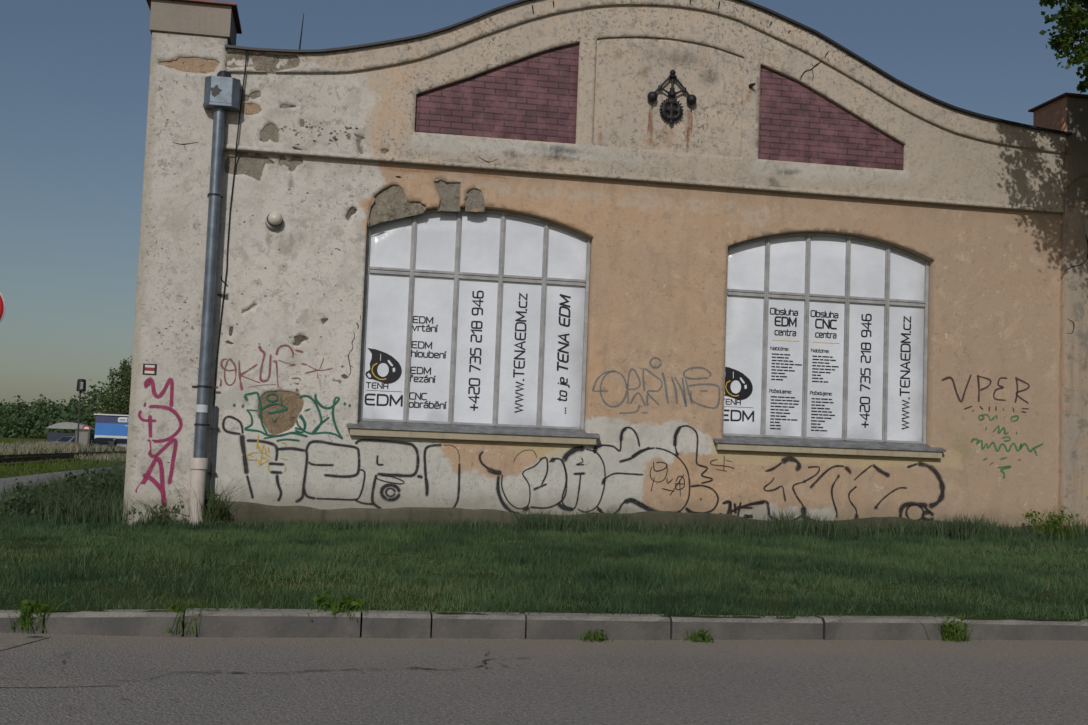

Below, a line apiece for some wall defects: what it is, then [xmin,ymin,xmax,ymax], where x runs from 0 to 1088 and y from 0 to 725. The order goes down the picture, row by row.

spalling [158,51,300,73]
peeling [241,91,262,115]
spalling [224,119,366,181]
spalling [368,179,485,227]